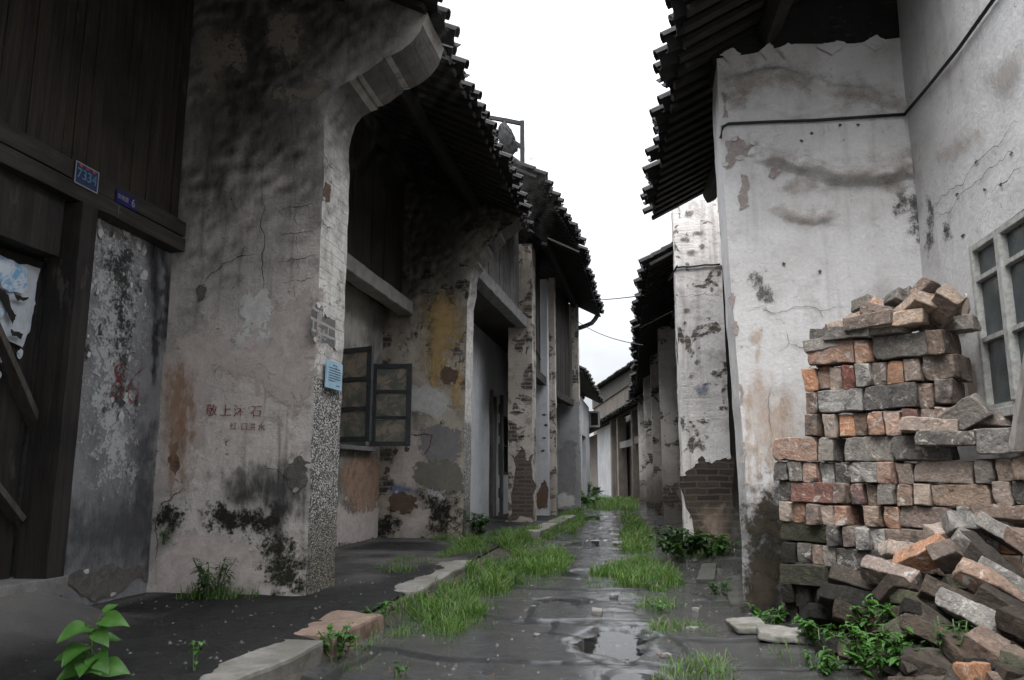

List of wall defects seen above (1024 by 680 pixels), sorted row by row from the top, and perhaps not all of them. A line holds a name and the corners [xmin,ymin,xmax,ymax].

peeling [505,414,576,522]